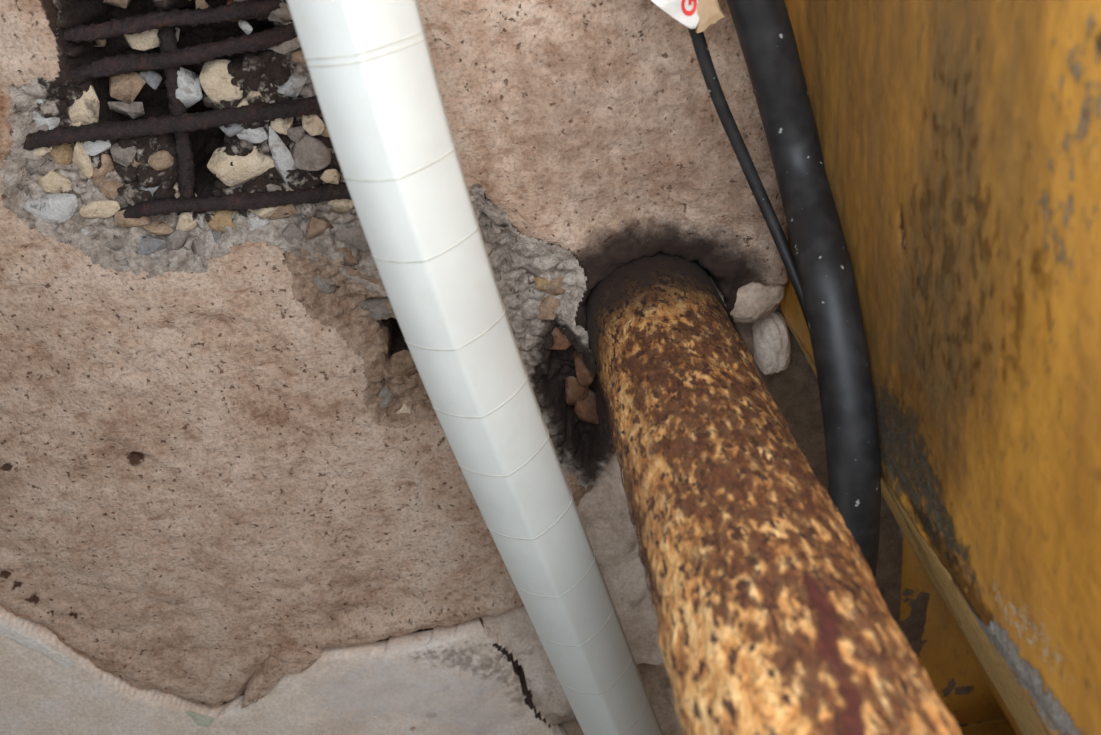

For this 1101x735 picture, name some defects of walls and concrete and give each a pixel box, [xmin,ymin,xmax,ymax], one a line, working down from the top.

crack [40,0,71,70]
spalling [0,0,436,428]
spalling [469,184,614,490]
spalling [0,571,39,604]
peeling [881,476,1081,735]
spalling [241,646,321,708]
crack [493,643,551,728]